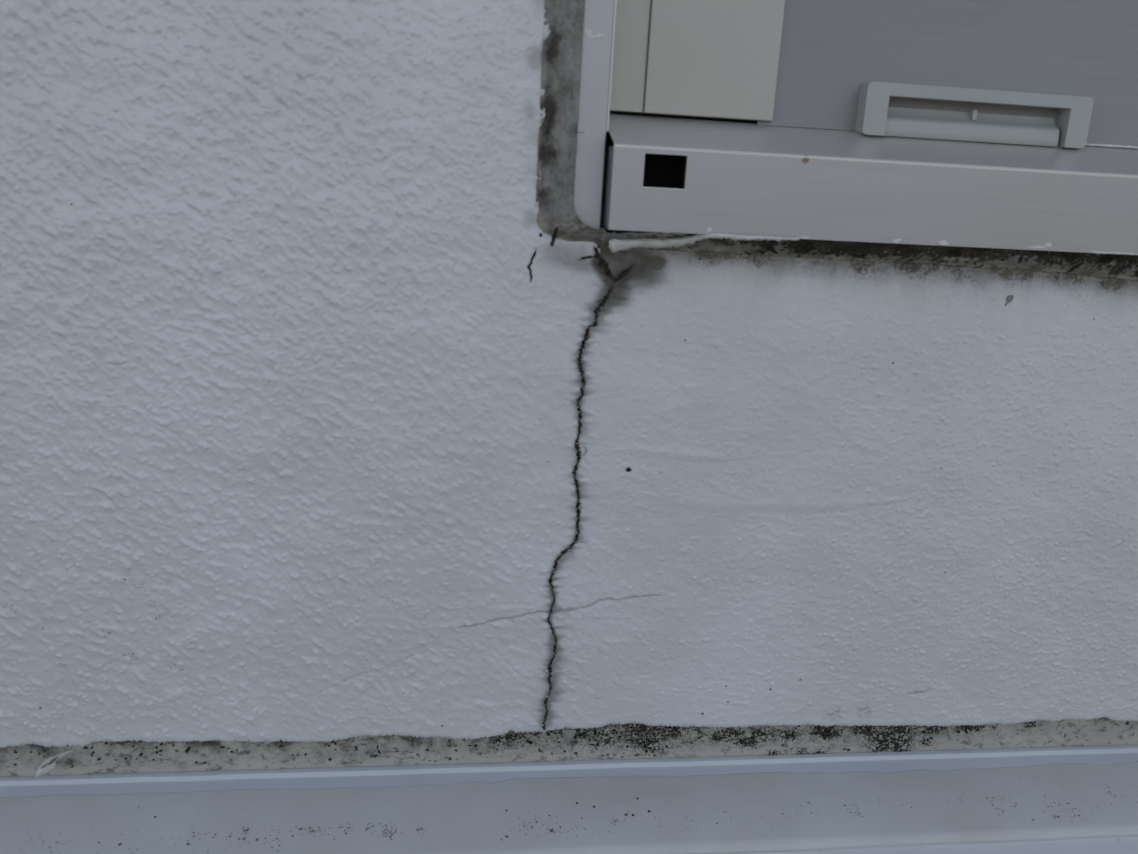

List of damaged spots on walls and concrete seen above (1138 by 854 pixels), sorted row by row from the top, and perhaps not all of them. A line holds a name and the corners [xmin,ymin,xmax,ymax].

damp [546,31,560,63]
damp [539,97,557,164]
damp [591,249,666,298]
damp [696,238,1138,290]
crack [541,247,633,733]
damp [64,724,998,768]